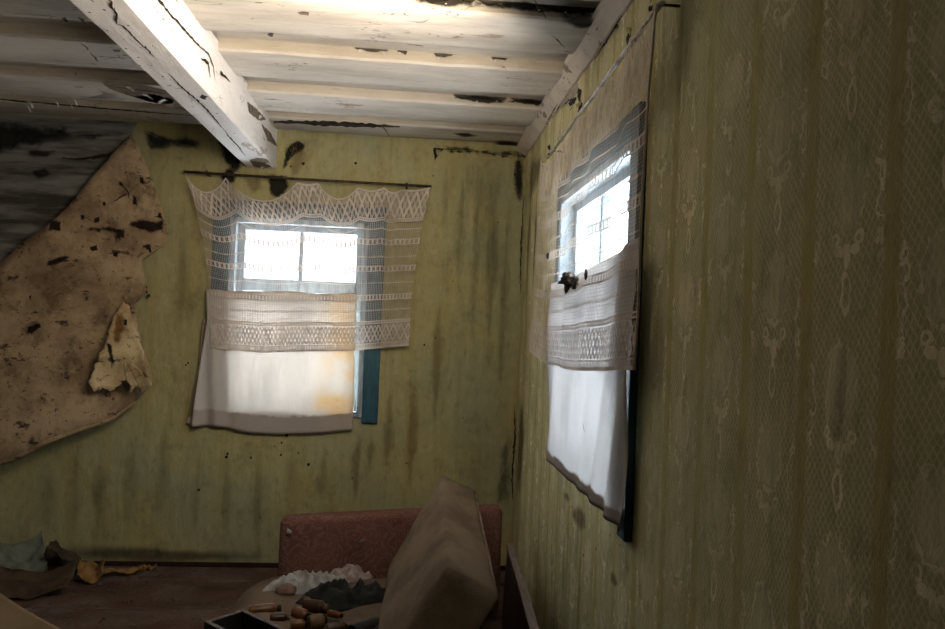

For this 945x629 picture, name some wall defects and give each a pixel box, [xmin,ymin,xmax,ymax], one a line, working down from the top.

peeling [416,0,596,15]
peeling [355,47,407,55]
peeling [103,76,183,107]
peeling [453,94,543,106]
peeling [247,102,277,146]
leakage [146,134,198,149]
leakage [218,141,240,184]
peeling [250,158,273,169]
leakage [269,141,305,197]